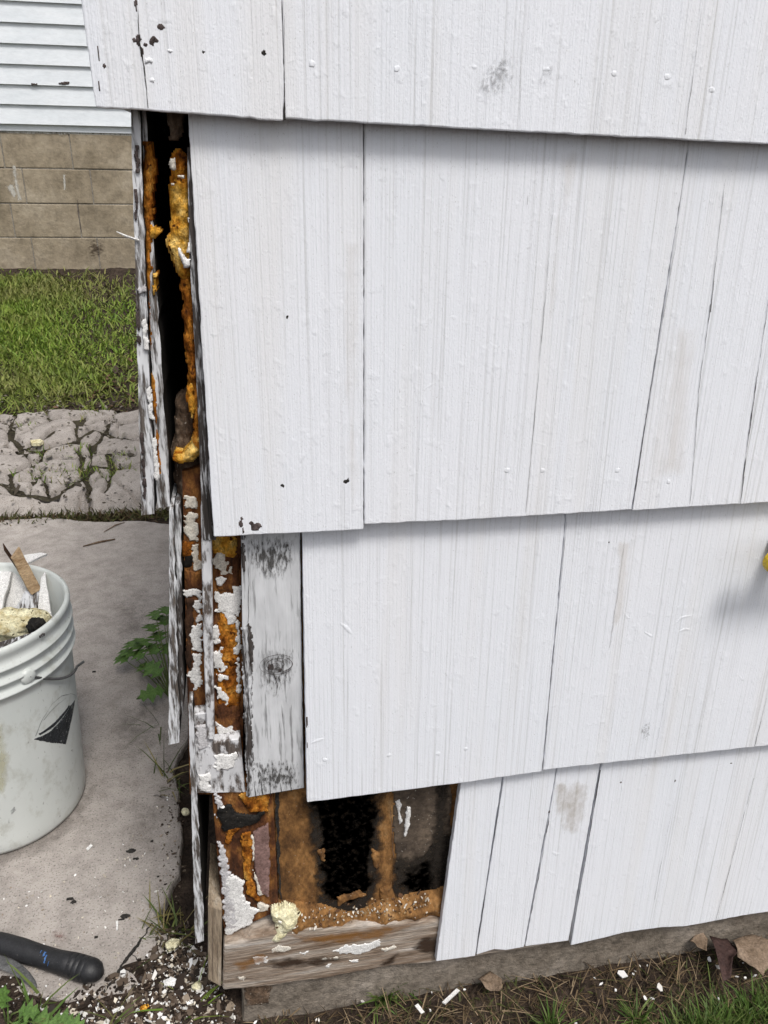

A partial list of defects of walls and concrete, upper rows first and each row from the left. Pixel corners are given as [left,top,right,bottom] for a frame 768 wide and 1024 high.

peeling [178,243,191,268]
peeling [135,284,149,350]
peeling [139,432,160,500]
damp [249,540,292,576]
peeling [183,495,242,705]
damp [264,653,290,688]
damp [217,804,265,832]
peeling [217,823,271,935]
spalling [337,890,366,906]
damp [305,785,451,912]
peeling [380,784,452,903]
peeling [322,939,397,968]